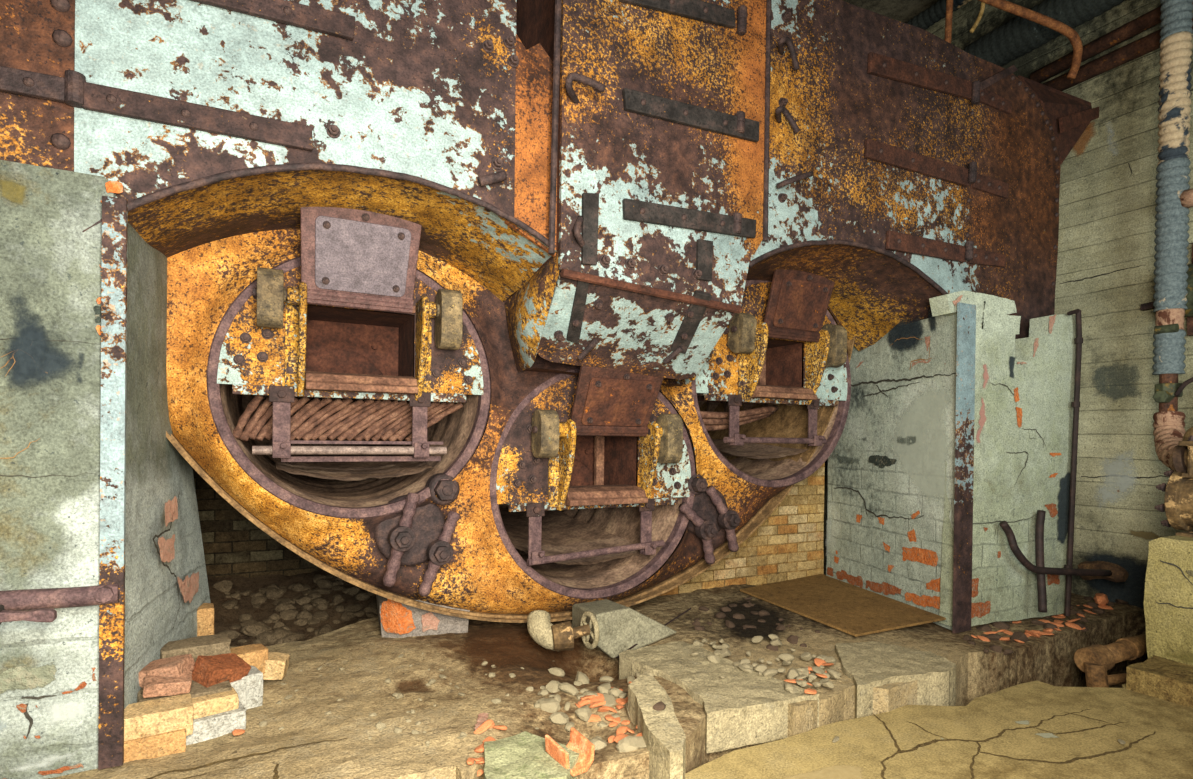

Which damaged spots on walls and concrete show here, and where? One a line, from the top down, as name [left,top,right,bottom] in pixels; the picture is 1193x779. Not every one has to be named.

leakage [8,298,83,387]
crack [834,487,924,519]
spalling [827,510,941,609]
crack [1156,560,1193,609]
crack [873,709,1156,779]